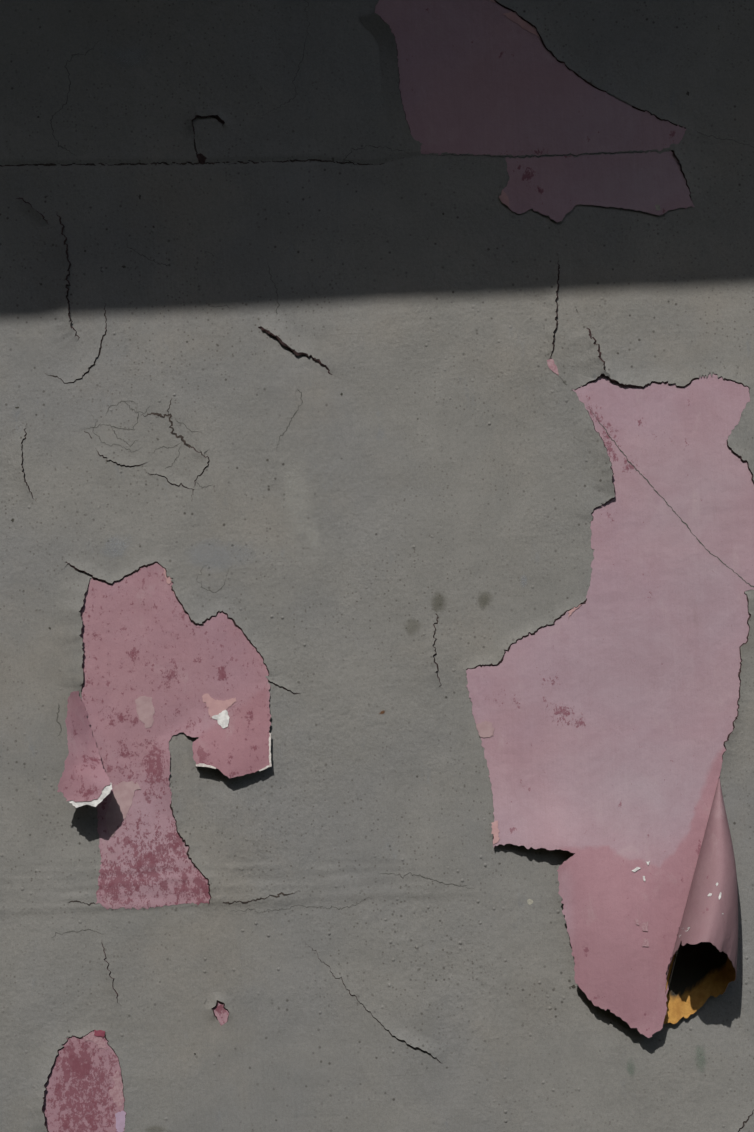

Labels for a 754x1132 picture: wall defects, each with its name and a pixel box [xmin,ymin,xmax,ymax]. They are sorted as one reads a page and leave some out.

crack [0,40,405,167]
peeling [358,0,705,222]
crack [256,265,346,379]
crack [84,399,212,501]
peeling [49,549,306,917]
peeling [456,359,754,1038]
crack [239,872,474,913]
crack [305,939,455,1064]
peeling [25,1019,136,1132]